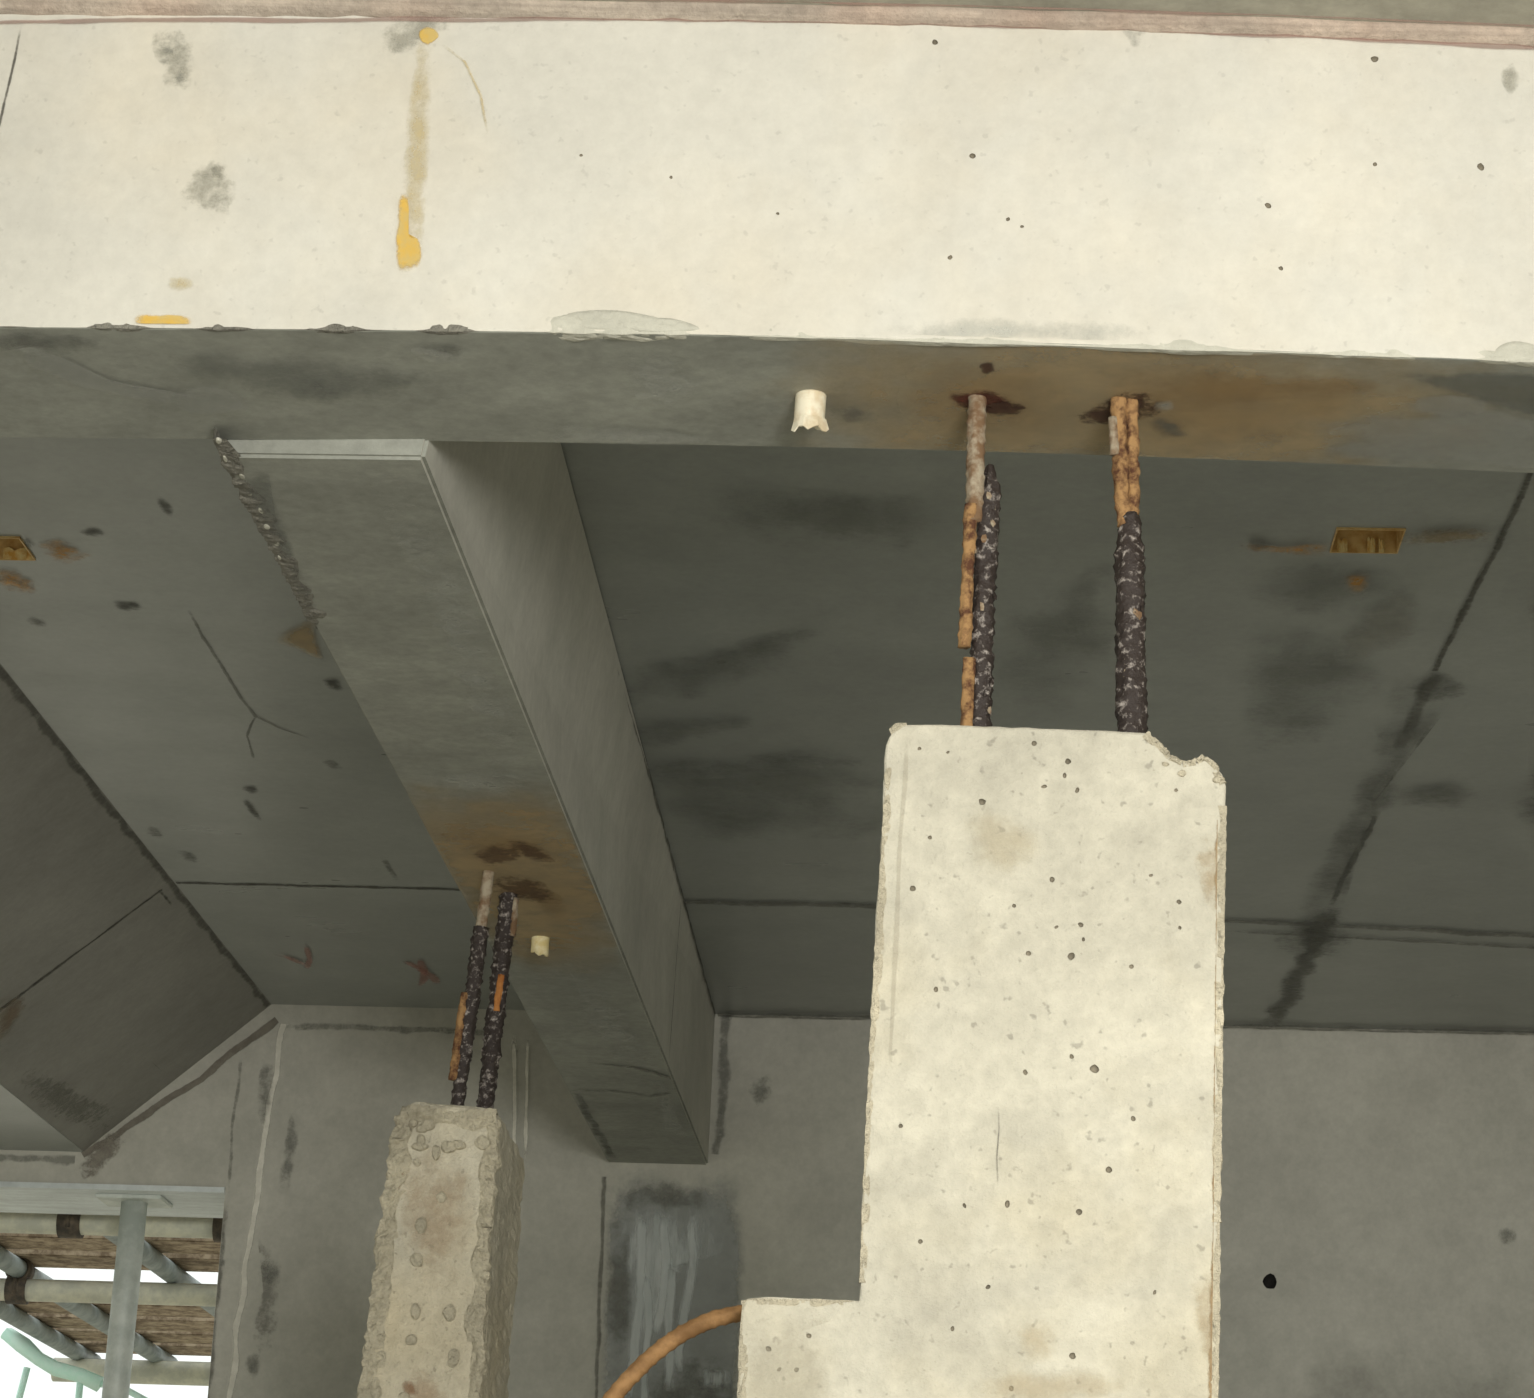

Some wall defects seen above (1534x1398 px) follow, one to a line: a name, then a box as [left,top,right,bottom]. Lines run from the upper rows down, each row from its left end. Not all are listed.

corrosion [893,347,1417,460]
spalling [213,427,327,629]
corrosion [975,492,996,560]
crack [1397,473,1533,748]
corrosion [434,810,603,950]
crack [1225,816,1534,1019]
crack [0,667,529,1398]
leakage [605,1187,739,1398]